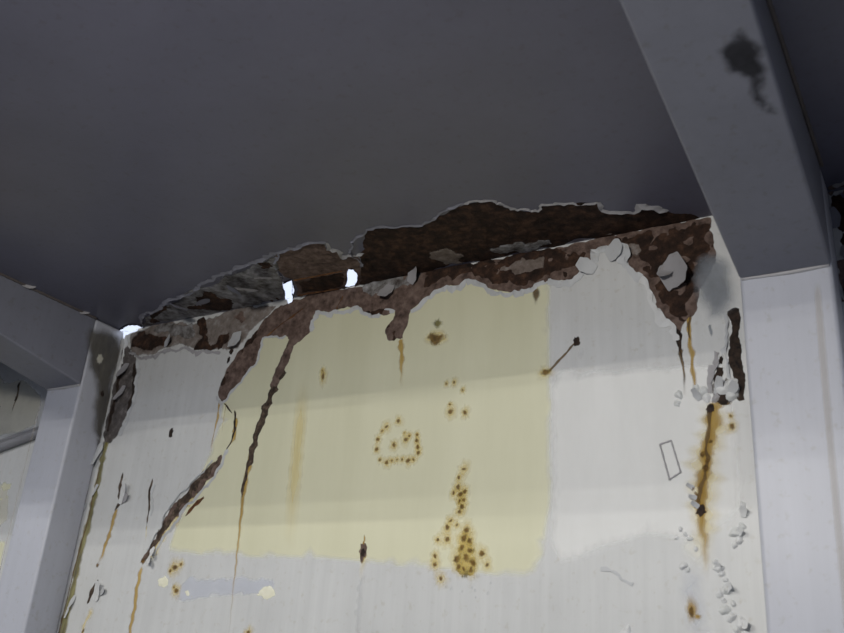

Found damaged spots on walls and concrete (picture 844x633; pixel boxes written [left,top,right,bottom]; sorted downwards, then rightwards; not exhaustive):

peeling [129,252,284,363]
peeling [695,257,731,315]
peeling [828,190,844,302]
crack [90,335,141,464]
corrosion [212,200,716,584]
peeling [674,376,740,407]
crack [82,473,128,633]
crack [129,403,238,633]
corrosion [686,402,736,552]